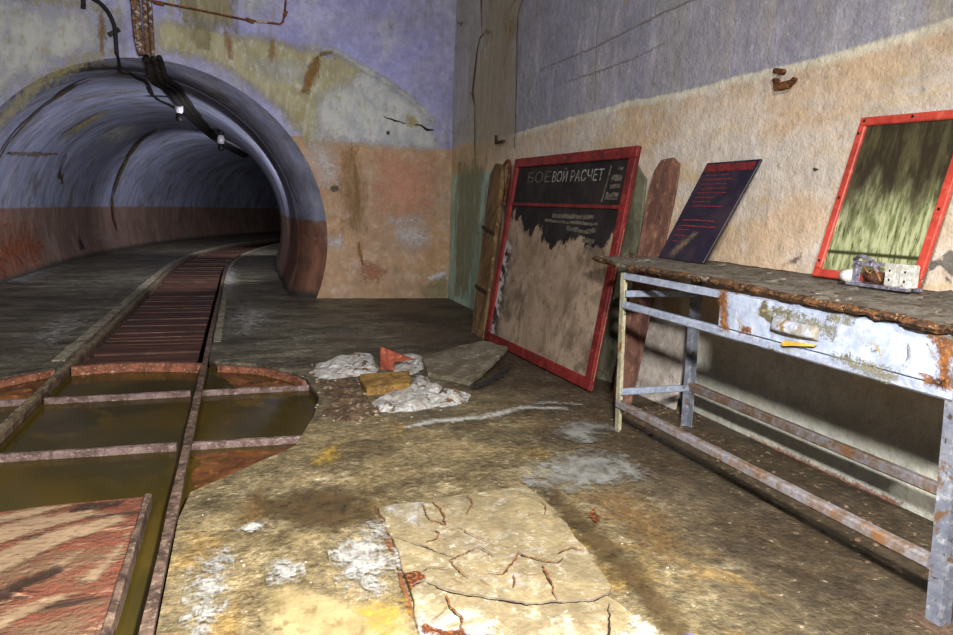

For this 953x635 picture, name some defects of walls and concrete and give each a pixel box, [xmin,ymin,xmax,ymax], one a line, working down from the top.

crack [384,116,434,131]
crack [471,0,492,169]
crack [506,0,691,146]
peeling [900,250,953,313]
crack [374,495,611,635]